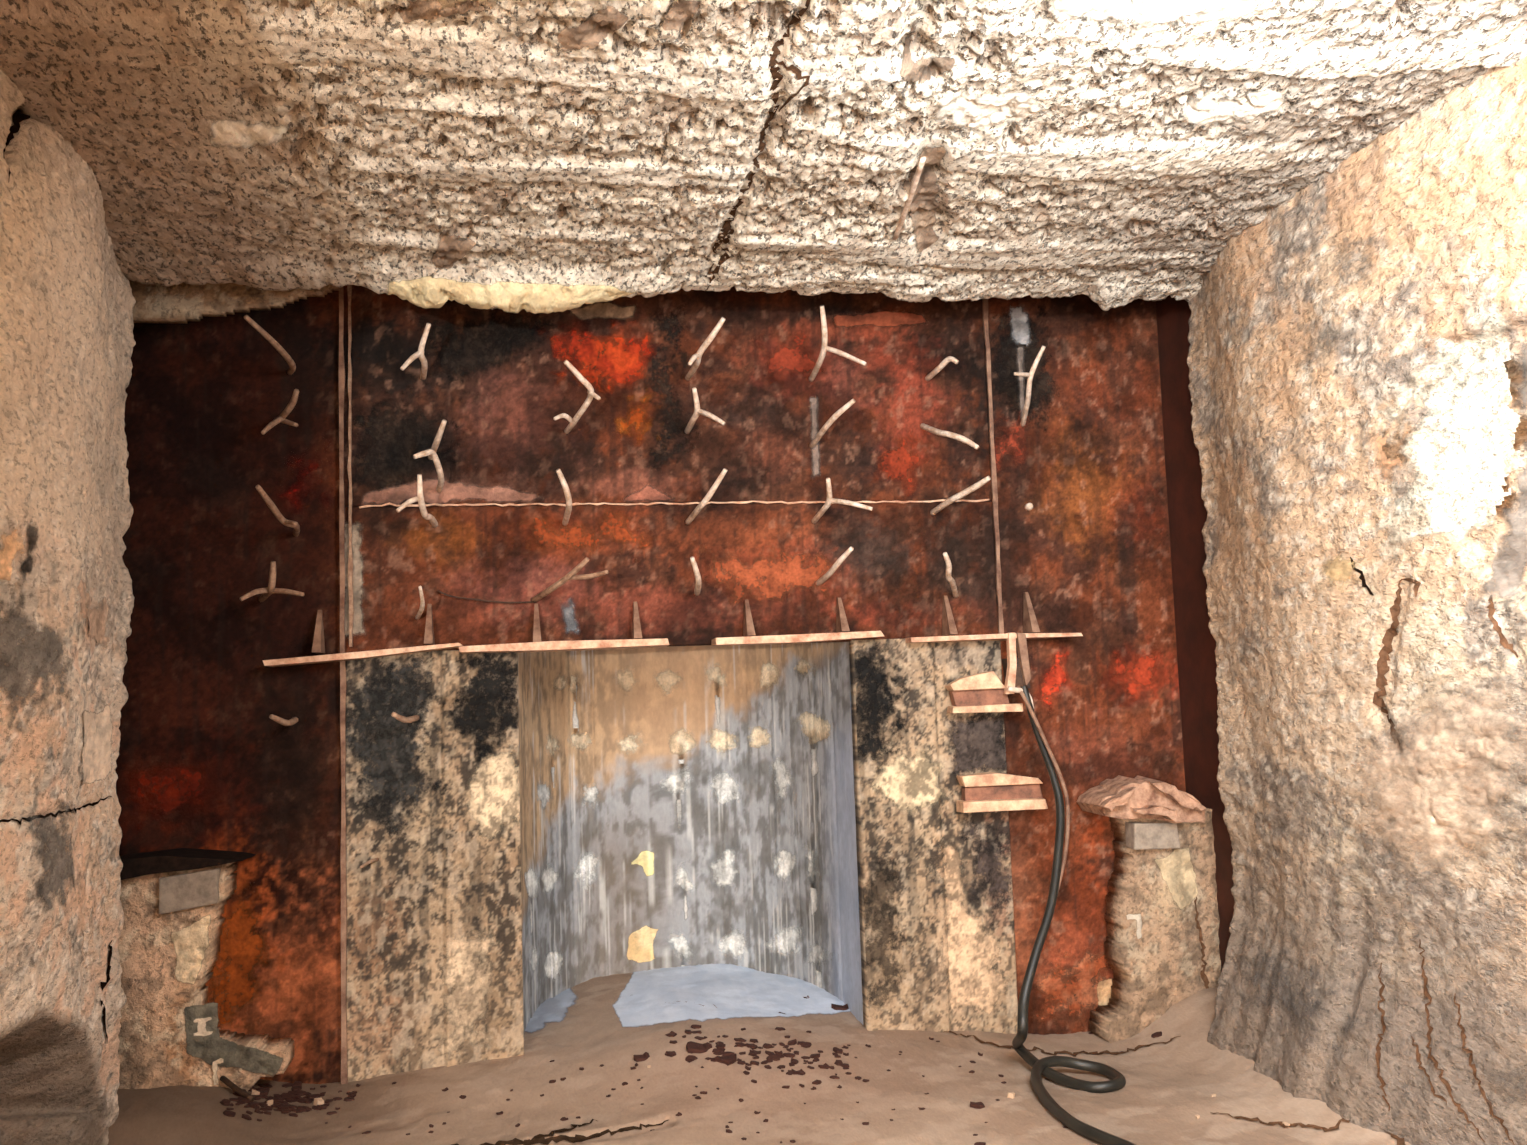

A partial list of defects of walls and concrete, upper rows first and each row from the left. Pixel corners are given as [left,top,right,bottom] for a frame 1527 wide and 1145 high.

crack [705,0,811,291]
corrosion [544,322,660,444]
spalling [1379,311,1521,557]
corrosion [700,547,831,604]
mould [345,652,452,836]
mould [450,653,519,761]
water stain [854,644,908,771]
water stain [947,715,1007,776]
crack [1350,557,1421,744]
corrosion [1032,952,1107,1021]
crack [1210,939,1514,1145]
crack [452,1119,668,1145]